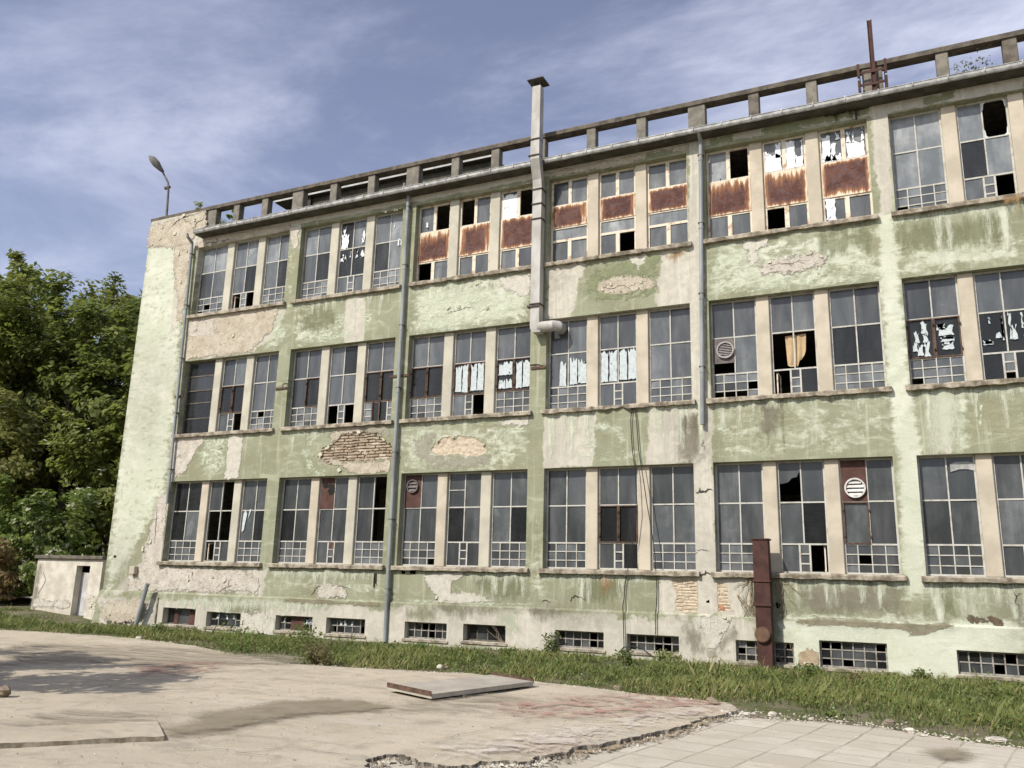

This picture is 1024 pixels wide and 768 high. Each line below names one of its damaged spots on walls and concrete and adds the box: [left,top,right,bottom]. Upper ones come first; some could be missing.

damp [897,201,1022,255]
peeling [146,210,302,361]
peeling [597,254,657,295]
peeling [742,236,827,276]
spalling [313,425,392,474]
spalling [431,435,488,457]
damp [648,392,888,459]
peeling [127,493,260,595]
spalling [672,577,734,658]